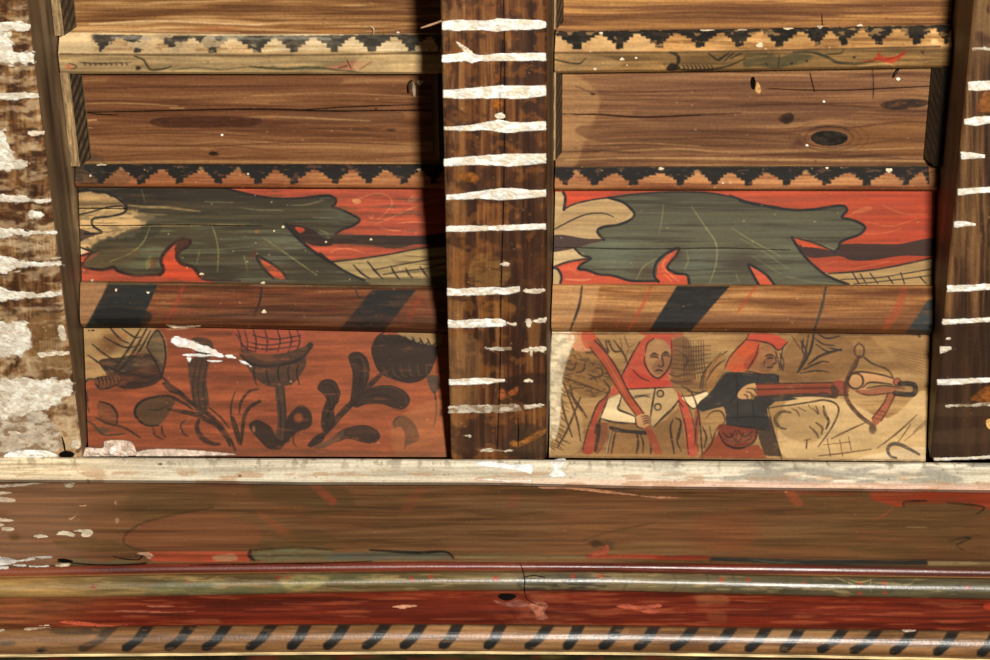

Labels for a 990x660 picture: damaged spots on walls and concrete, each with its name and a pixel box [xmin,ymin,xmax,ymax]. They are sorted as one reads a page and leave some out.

peeling [0,482,50,502]
peeling [34,504,93,538]
peeling [0,556,52,569]